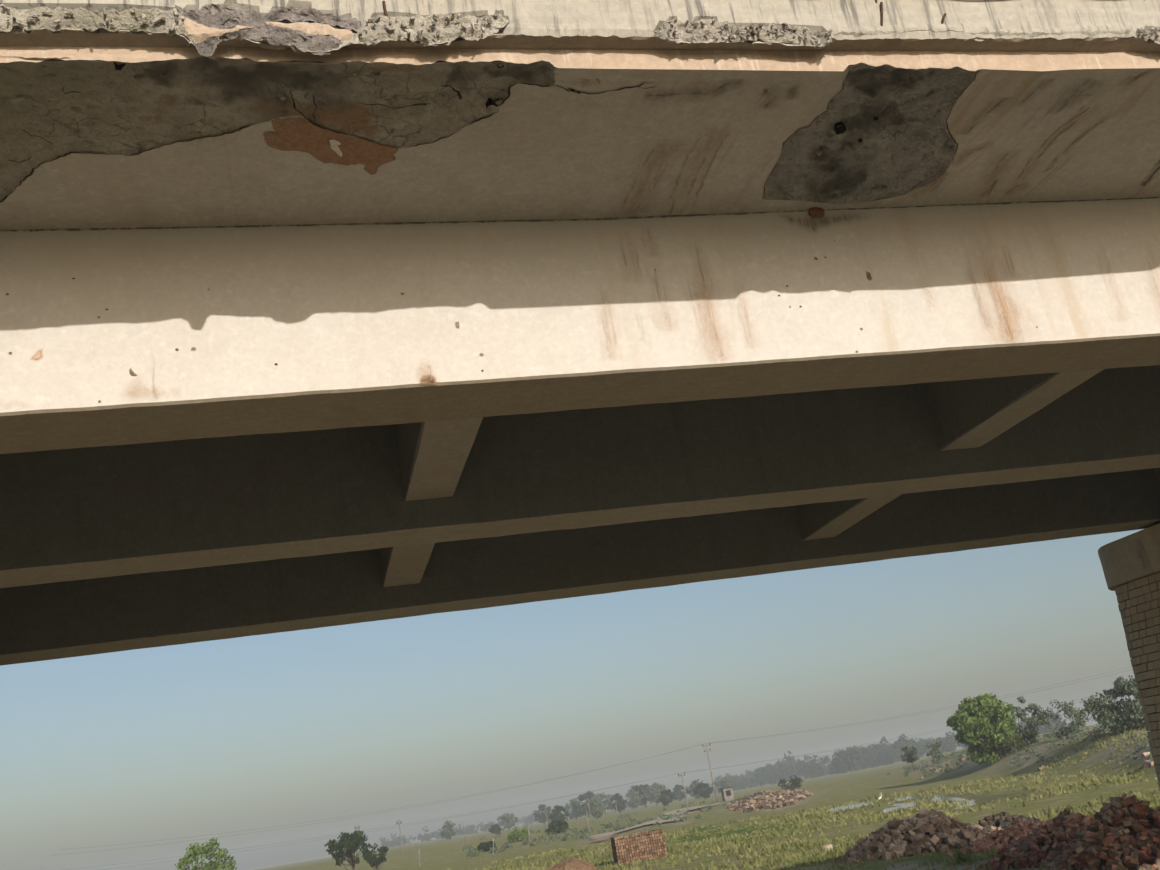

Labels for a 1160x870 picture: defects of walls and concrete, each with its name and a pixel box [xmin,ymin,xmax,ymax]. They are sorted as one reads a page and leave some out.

spalling [0,1,556,201]
spalling [653,18,833,49]
spalling [762,63,983,203]
spalling [966,24,1160,45]